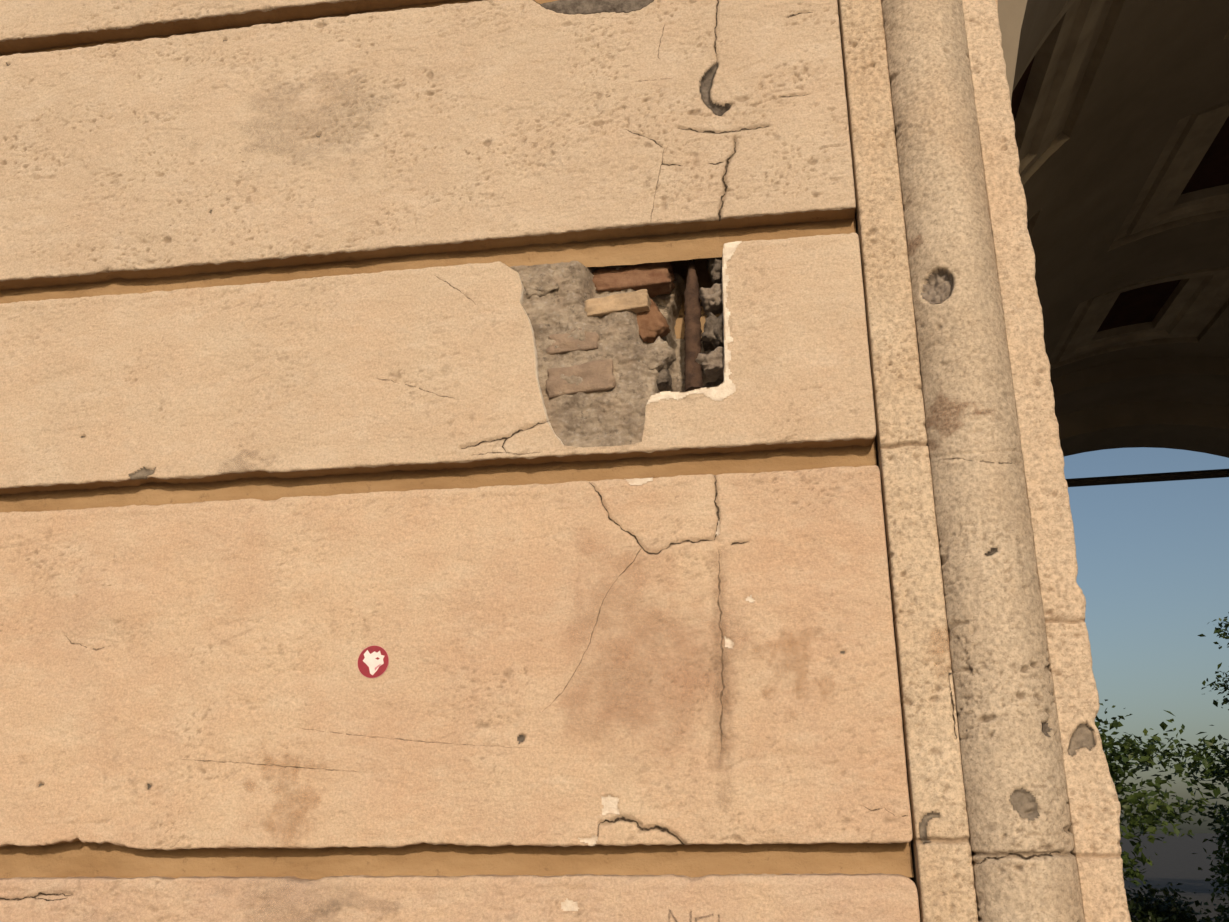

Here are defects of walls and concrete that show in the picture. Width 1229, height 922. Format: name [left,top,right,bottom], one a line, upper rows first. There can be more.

crack [712,0,720,57]
crack [626,126,768,221]
spalling [501,241,742,448]
crack [461,420,550,455]
crack [542,478,749,740]
spalling [1068,724,1096,757]
crack [597,817,685,845]
spalling [1009,788,1040,821]